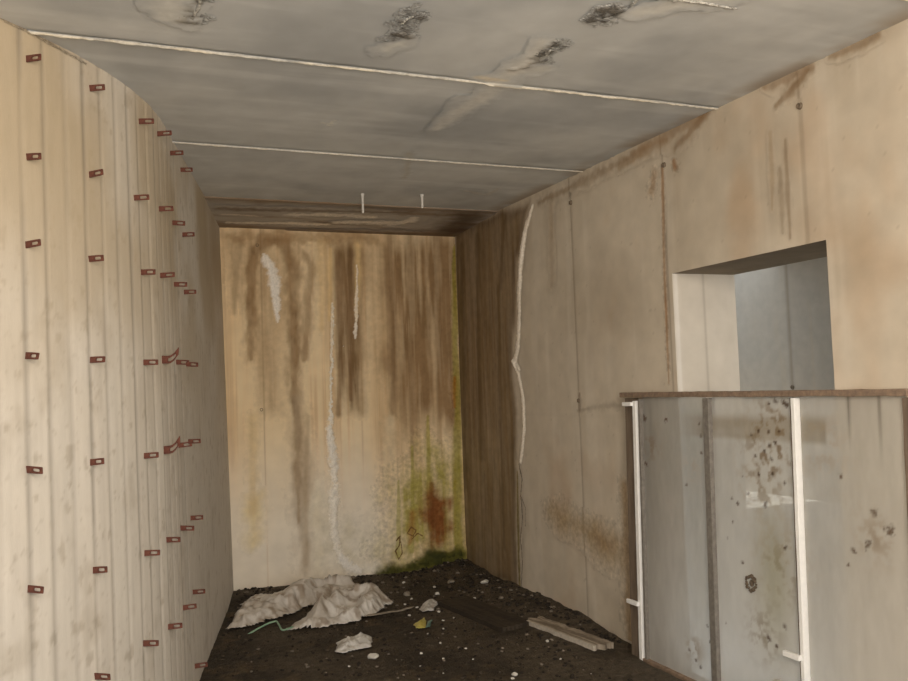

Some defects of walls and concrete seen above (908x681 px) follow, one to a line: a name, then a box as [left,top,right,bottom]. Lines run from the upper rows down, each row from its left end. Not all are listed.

corrosion [405,476,458,548]
leakage [208,110,715,586]